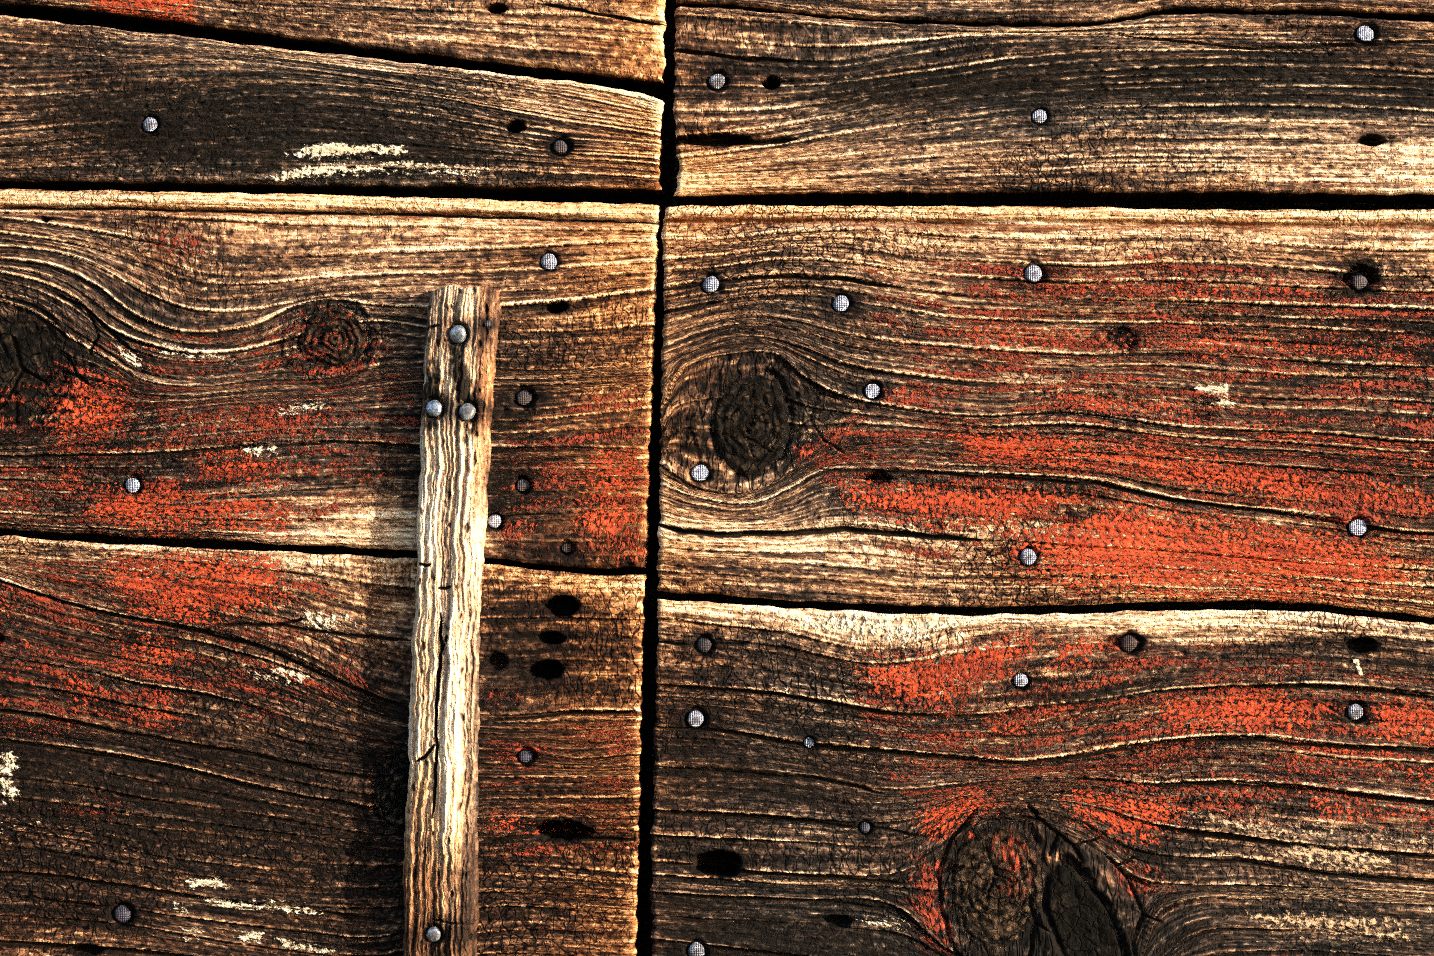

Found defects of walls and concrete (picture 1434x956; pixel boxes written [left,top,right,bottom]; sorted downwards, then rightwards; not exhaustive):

peeling [0,309,421,805]
peeling [499,378,650,567]
peeling [793,253,1434,606]
crack [0,562,452,819]
peeling [481,711,639,862]